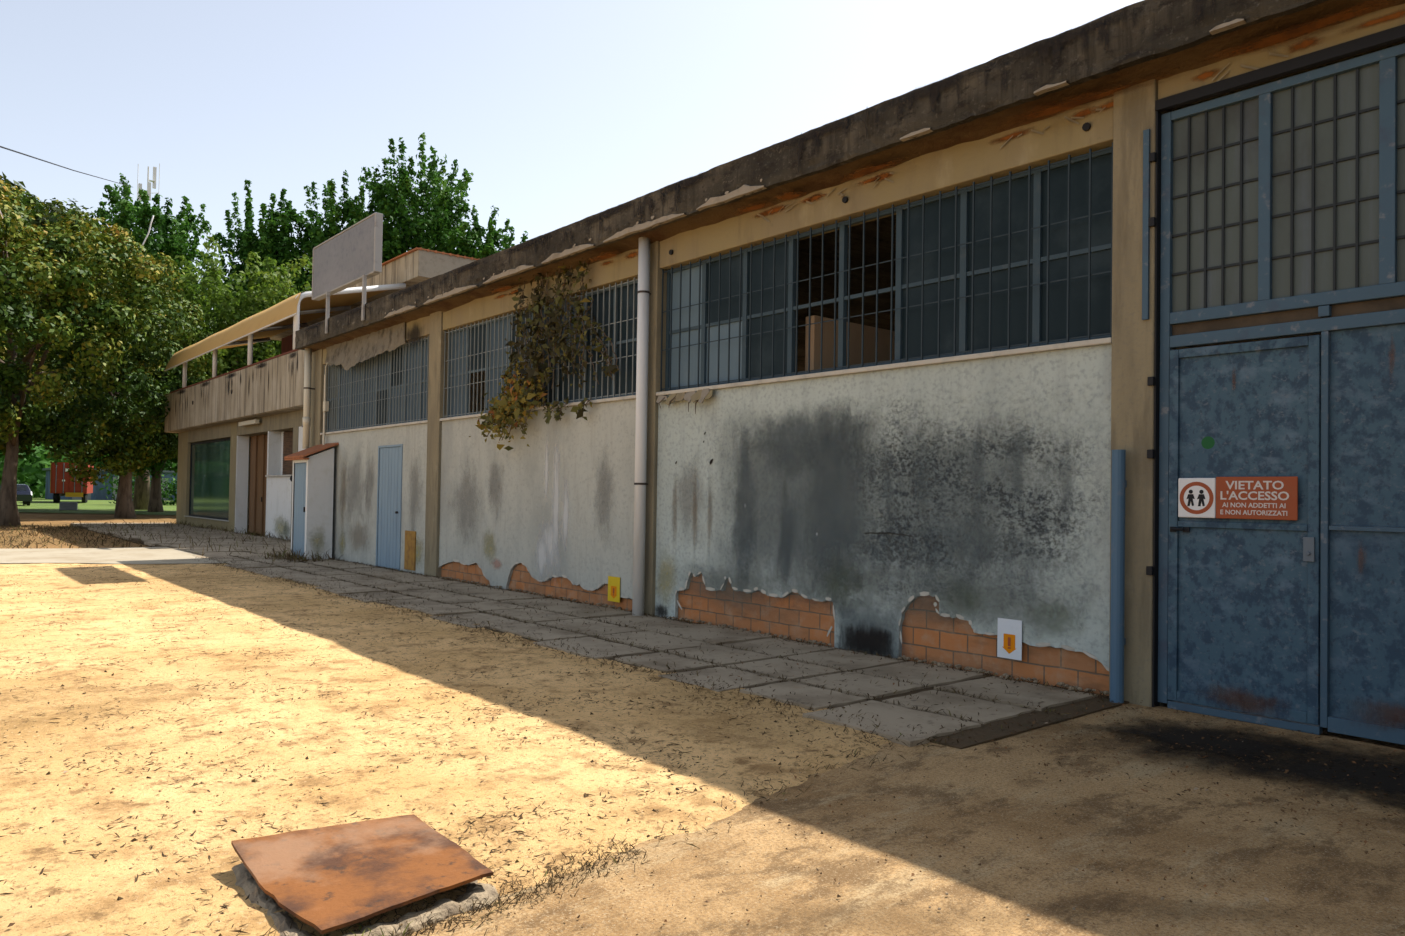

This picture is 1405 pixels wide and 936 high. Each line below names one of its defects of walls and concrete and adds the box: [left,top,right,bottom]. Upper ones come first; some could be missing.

flaking render [438,559,490,586]
flaking render [507,561,632,611]
flaking render [675,572,835,647]
flaking render [898,591,1109,696]